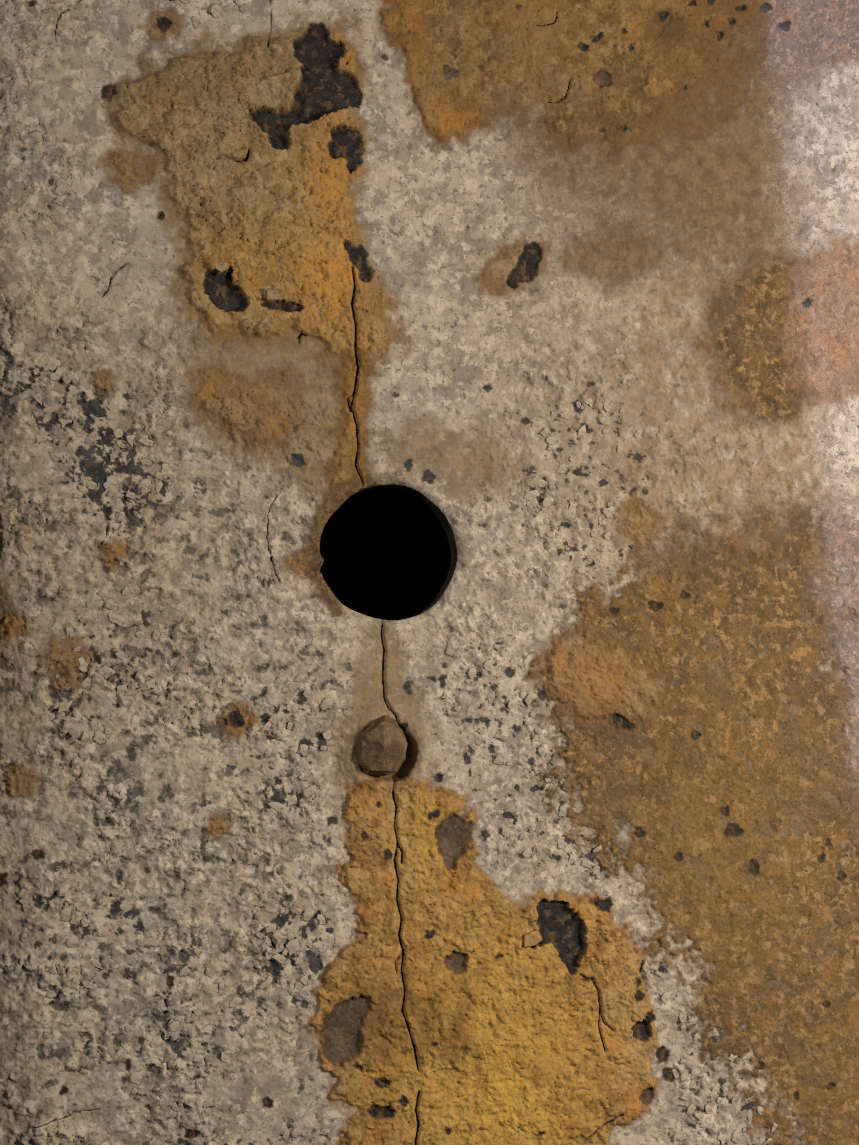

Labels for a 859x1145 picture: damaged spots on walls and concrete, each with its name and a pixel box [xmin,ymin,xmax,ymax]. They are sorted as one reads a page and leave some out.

spalling [244,23,363,150]
spalling [328,126,365,173]
rust [379,0,859,150]
rust [99,24,399,501]
spalling [203,262,303,312]
crack [347,279,361,477]
rust [708,241,859,420]
crack [381,622,398,723]
crack [392,782,403,895]
rust [306,499,859,1145]
spalling [523,899,593,982]
crack [398,922,420,1145]